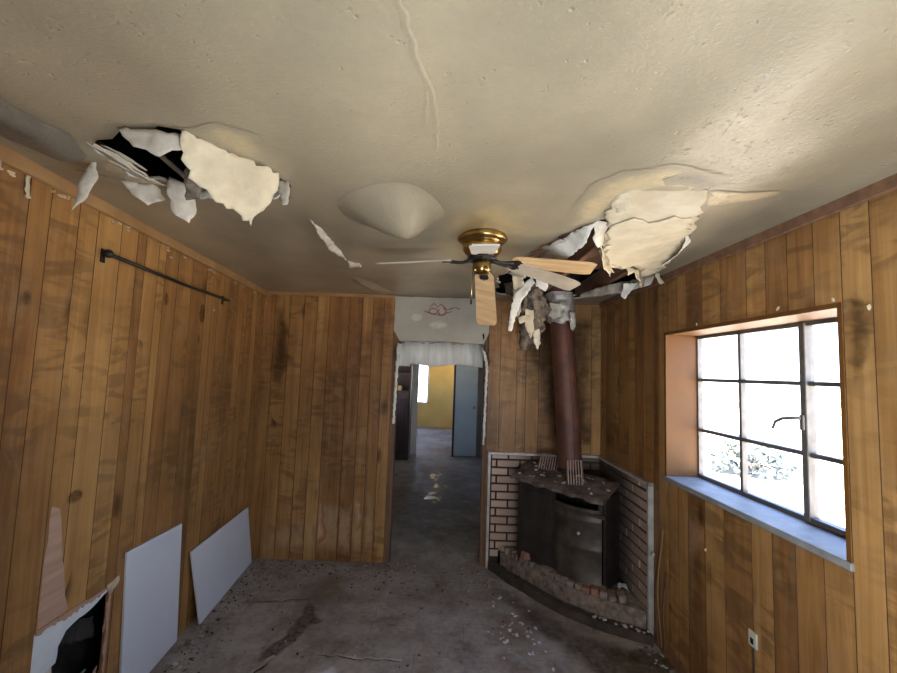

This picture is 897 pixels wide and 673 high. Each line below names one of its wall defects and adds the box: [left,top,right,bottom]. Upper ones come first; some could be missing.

hole [30,575,120,673]
crack [248,655,275,673]